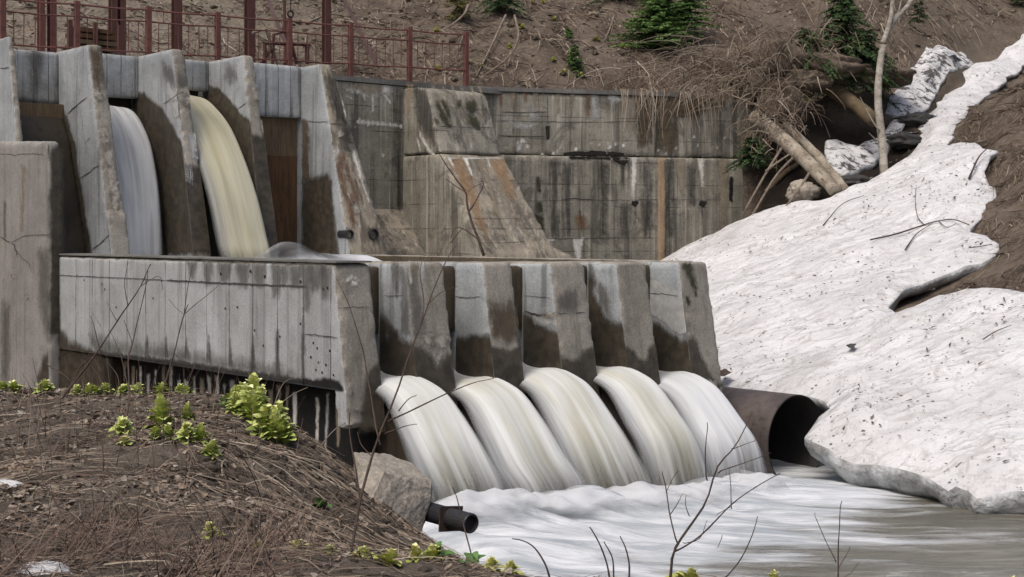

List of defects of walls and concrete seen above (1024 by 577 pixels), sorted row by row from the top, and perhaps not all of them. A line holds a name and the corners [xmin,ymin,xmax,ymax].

leakage [415,86,498,176]
corrosion [336,155,362,217]
leakage [657,136,714,236]
leakage [361,152,724,432]
leakage [92,338,297,426]
leakage [315,394,340,447]